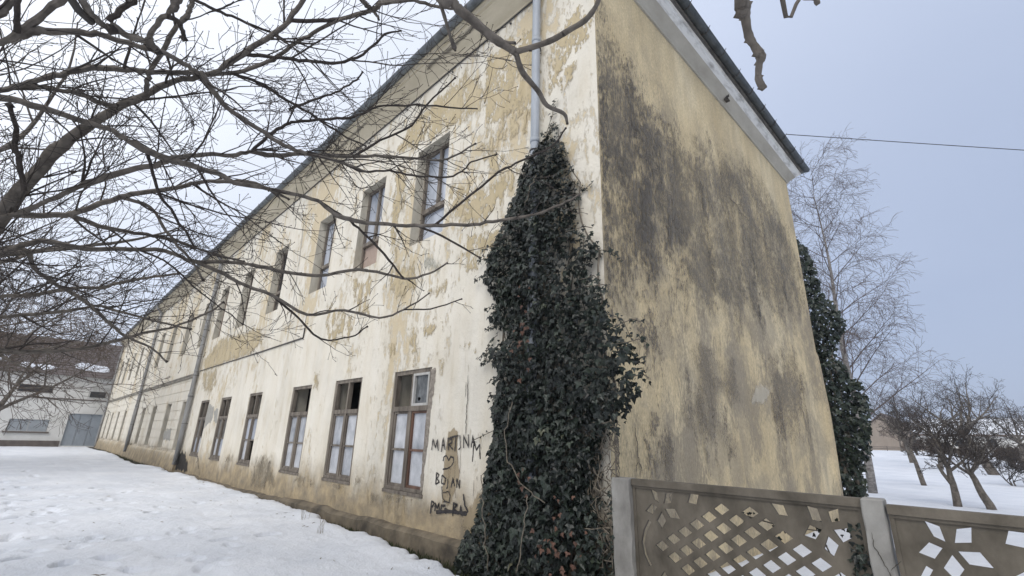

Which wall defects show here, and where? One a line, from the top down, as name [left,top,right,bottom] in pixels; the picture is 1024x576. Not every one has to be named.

peeling [397,4,595,272]
peeling [388,168,447,301]
leakage [596,1,815,481]
peeling [201,327,262,428]
peeling [325,276,372,349]
peeling [408,316,443,367]
leakage [175,450,188,473]
leakage [252,458,273,487]